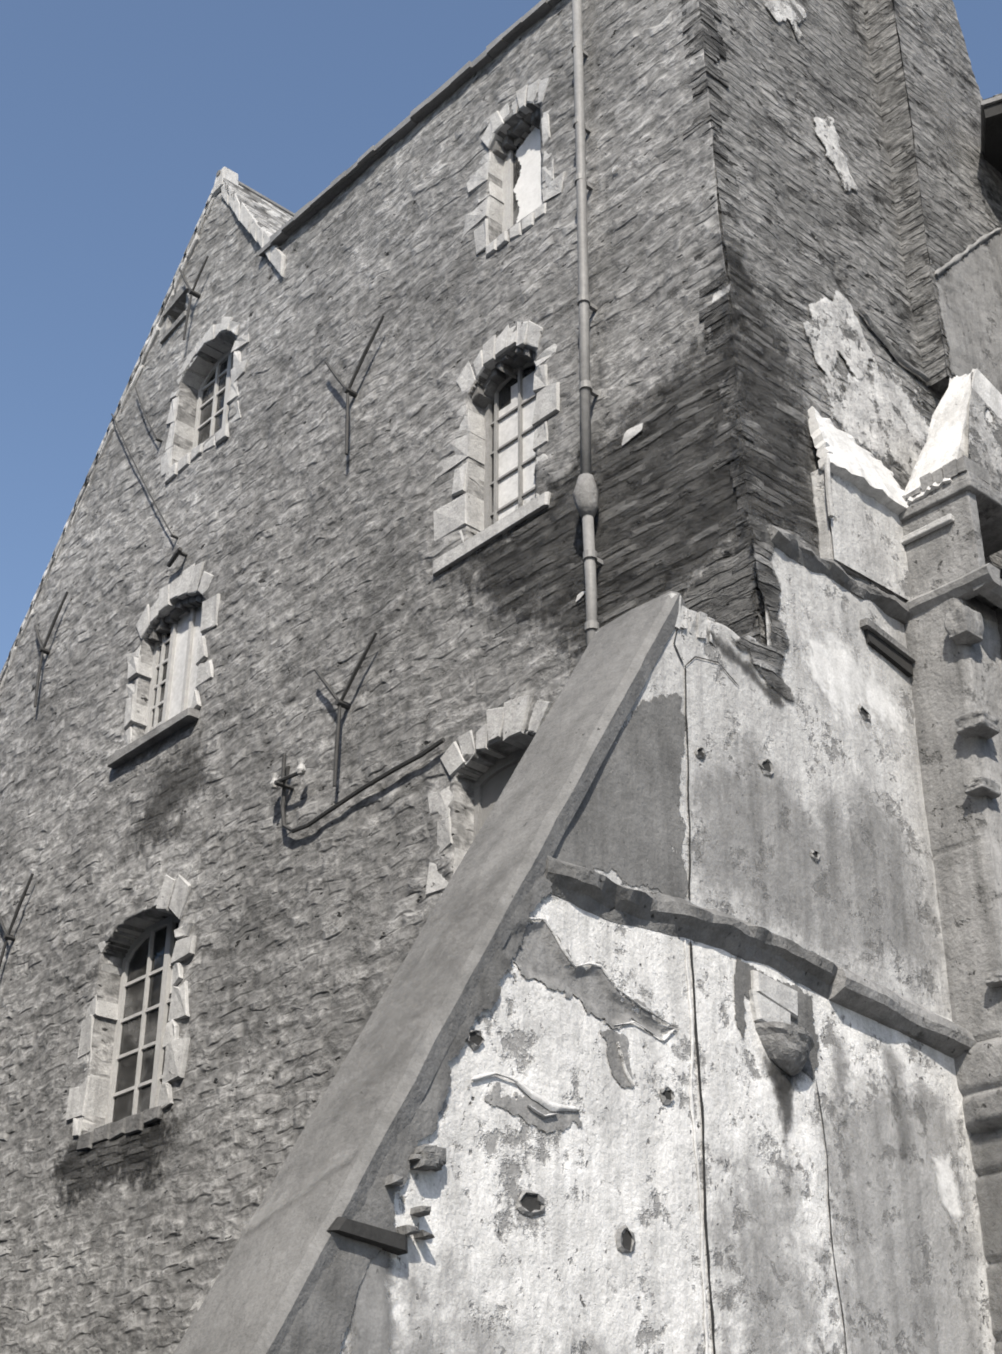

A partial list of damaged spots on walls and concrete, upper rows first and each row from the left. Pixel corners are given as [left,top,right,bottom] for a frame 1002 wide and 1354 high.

flaking render [684,514,794,702]
damp [552,692,688,899]
crack [673,629,739,900]
flaking render [278,1237,382,1354]
flaking render [353,871,677,1233]
crack [684,938,716,1354]
damp [777,1075,793,1131]
crack [816,1081,847,1354]
damp [932,1154,964,1220]